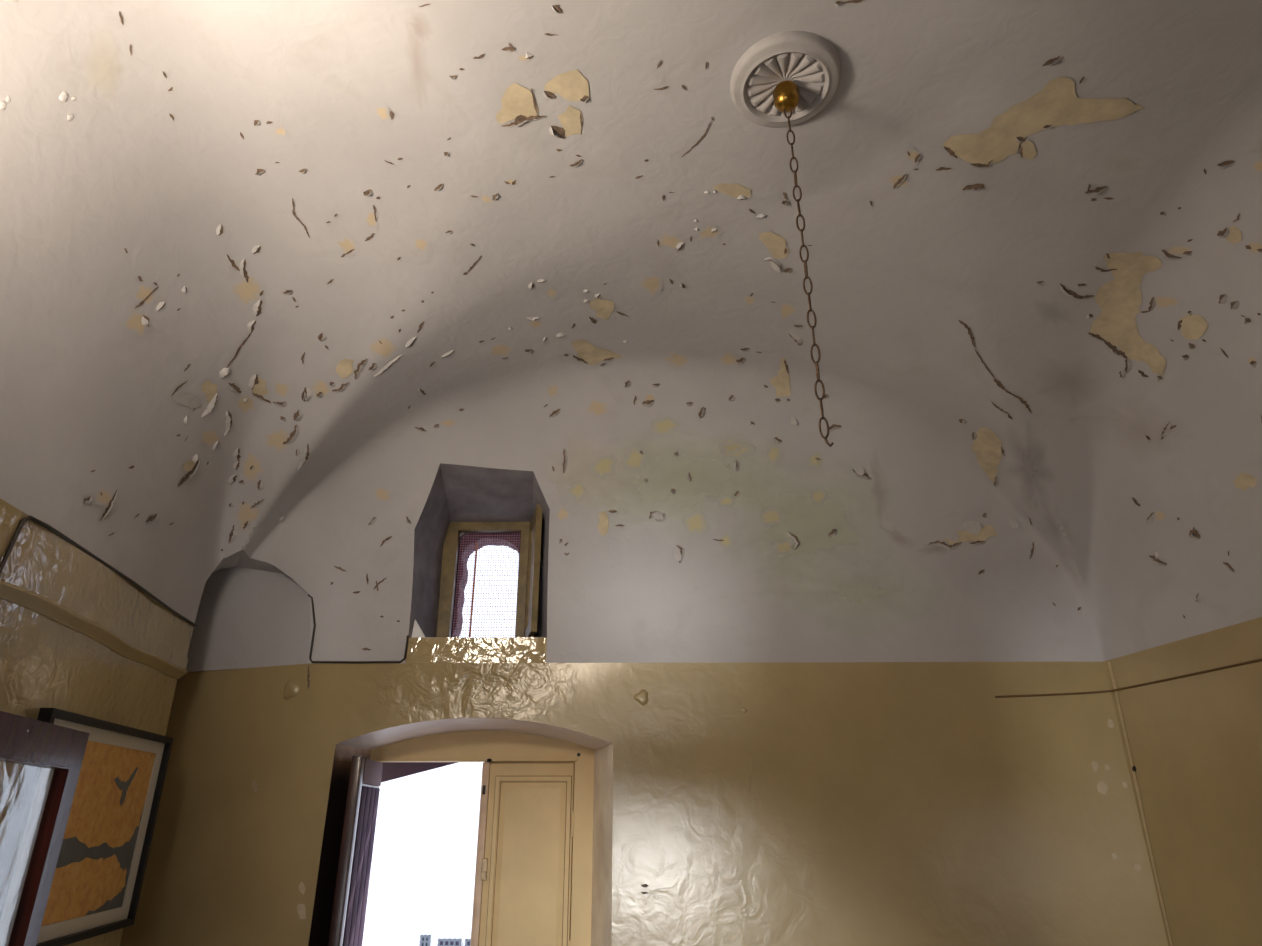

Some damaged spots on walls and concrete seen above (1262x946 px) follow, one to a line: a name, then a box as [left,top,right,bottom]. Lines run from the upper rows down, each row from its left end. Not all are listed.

peeling [496,70,590,152]
peeling [936,56,1144,192]
peeling [886,147,922,189]
peeling [334,189,380,257]
peeling [704,183,792,273]
peeling [225,245,266,333]
peeling [479,283,629,367]
peeling [1059,239,1208,381]
peeling [1218,294,1261,324]
peeling [171,310,424,552]
peeling [959,419,1005,487]